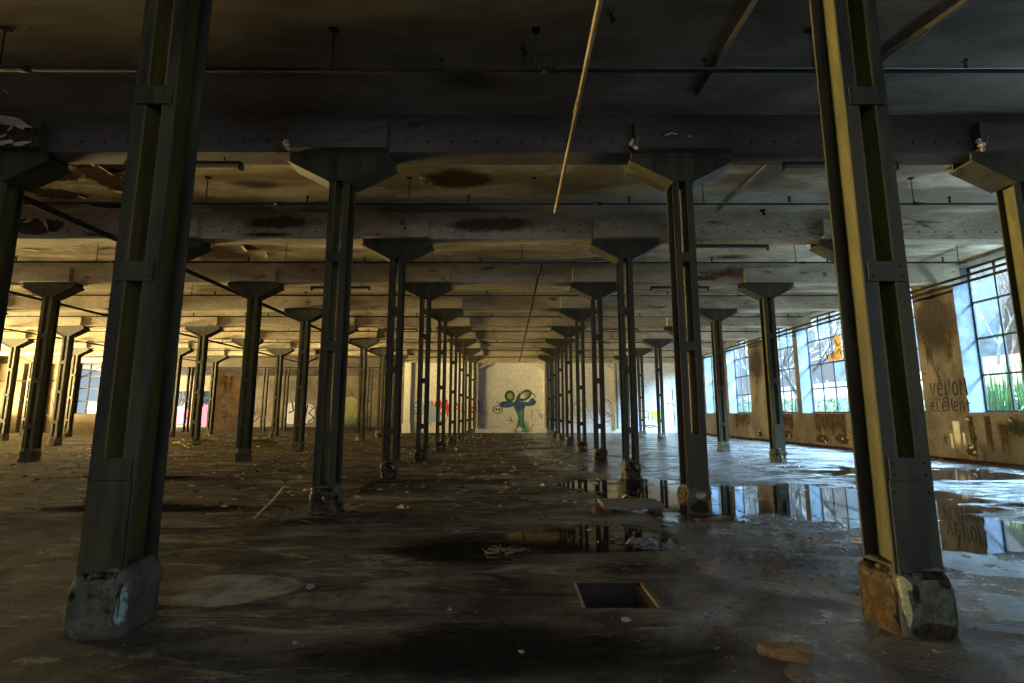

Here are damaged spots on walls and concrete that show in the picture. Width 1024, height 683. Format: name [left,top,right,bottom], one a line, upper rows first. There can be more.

flaking render [0,115,41,146]
peeling [25,164,124,209]
damp [419,169,490,188]
damp [455,218,531,231]
damp [736,414,750,427]
damp [783,412,793,428]
damp [813,412,846,434]
damp [950,416,1024,456]
spalling [939,575,951,590]
spalling [113,586,148,626]
spalling [896,576,920,628]